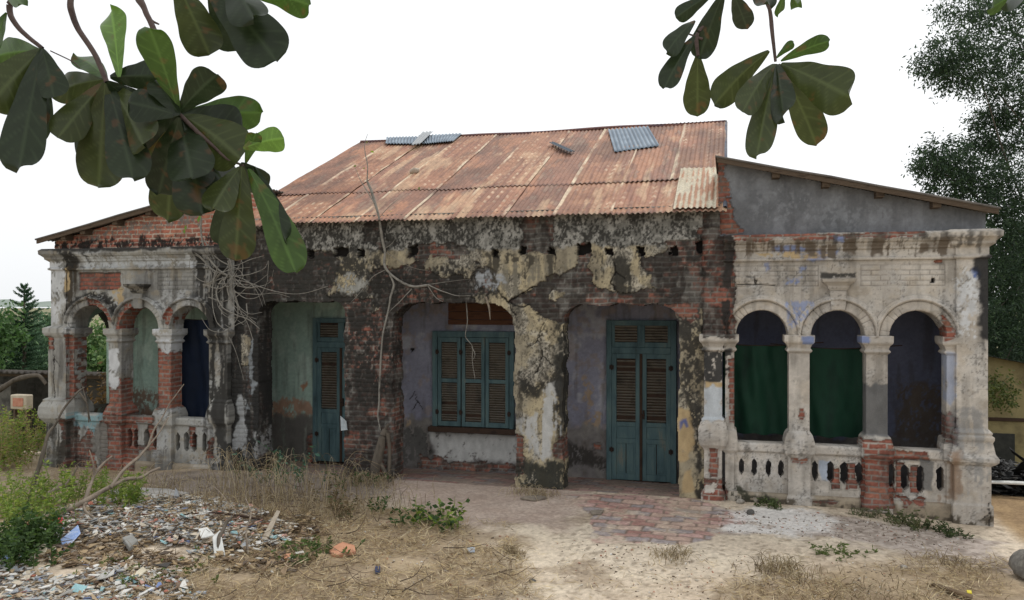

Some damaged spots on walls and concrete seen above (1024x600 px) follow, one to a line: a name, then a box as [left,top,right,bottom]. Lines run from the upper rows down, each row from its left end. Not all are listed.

spalling [511,163,833,339]
damp [732,174,1004,342]
spalling [46,334,184,471]
damp [38,232,313,471]
spalling [232,219,489,479]
damp [402,313,606,490]
spalling [677,406,729,501]
spalling [705,358,734,423]
spalling [813,437,930,510]